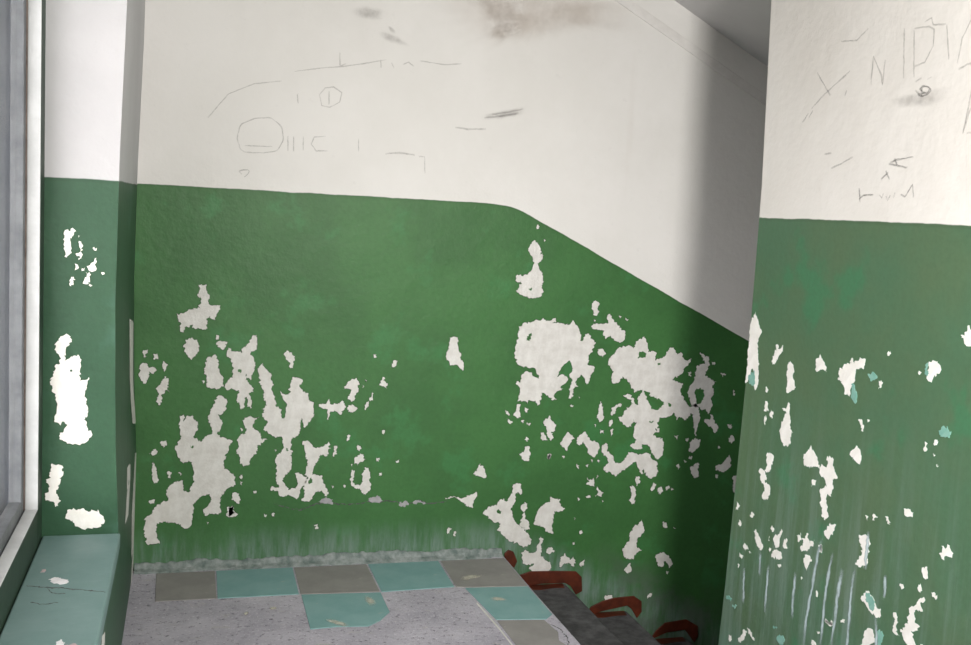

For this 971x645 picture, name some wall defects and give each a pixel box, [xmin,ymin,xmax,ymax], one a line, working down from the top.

peeling [62,227,105,287]
peeling [515,224,546,299]
peeling [49,333,93,446]
peeling [838,357,883,404]
peeling [125,284,398,582]
peeling [505,300,838,580]
peeling [849,444,862,465]
peeling [44,463,106,530]
peeling [445,482,585,571]
peeling [855,534,871,568]
peeling [811,618,846,645]
peeling [860,566,938,645]